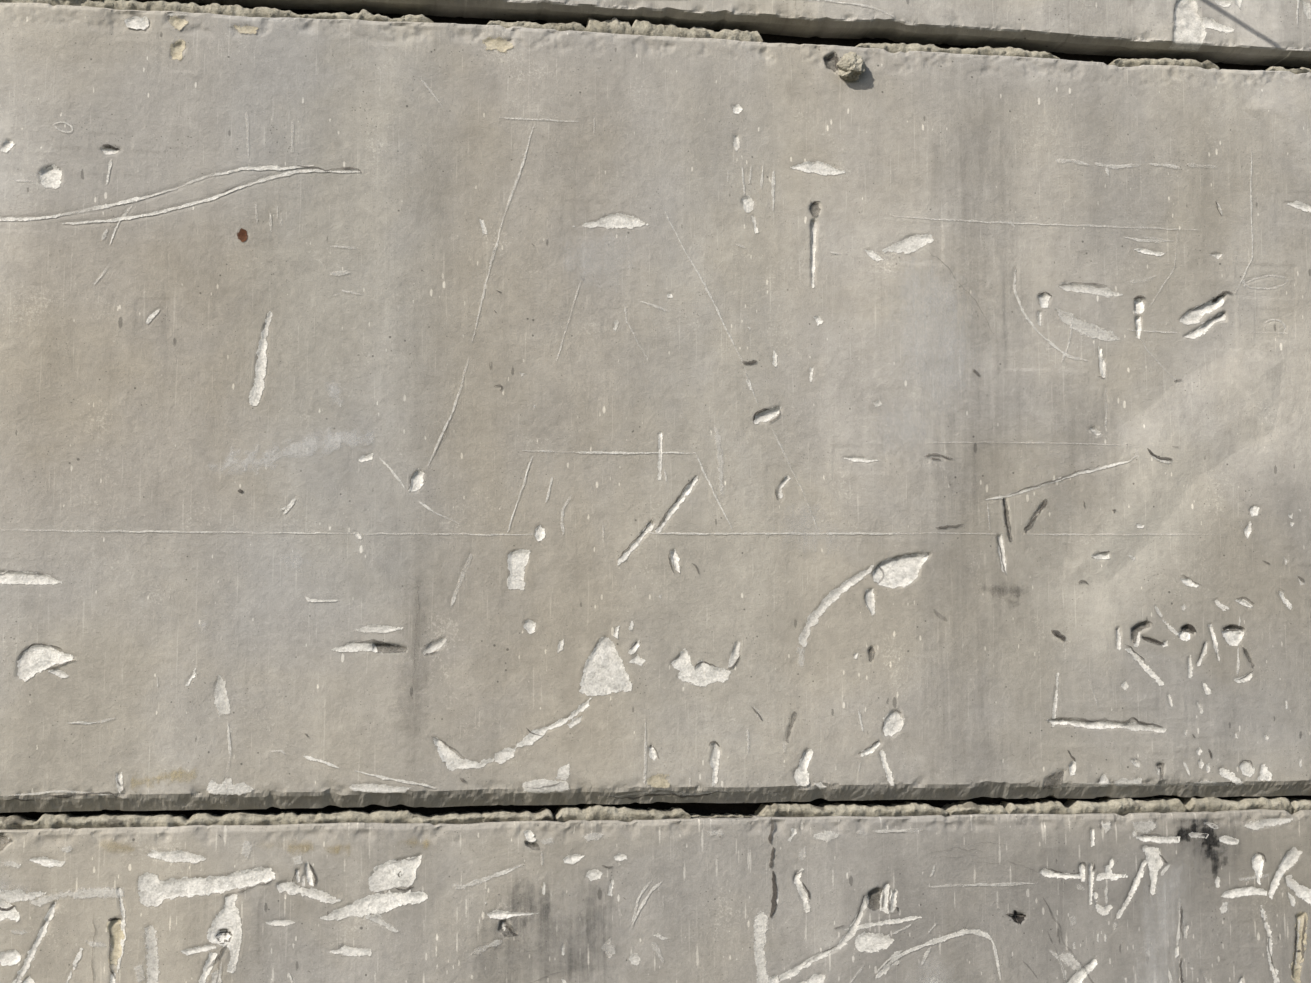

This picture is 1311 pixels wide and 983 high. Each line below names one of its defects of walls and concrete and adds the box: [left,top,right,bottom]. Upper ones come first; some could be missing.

spalling [798,553,929,647]
spalling [17,643,74,682]
spalling [433,620,645,782]
spalling [671,641,740,687]
peeling [0,900,56,983]
spalling [66,888,126,983]
spalling [138,855,428,983]